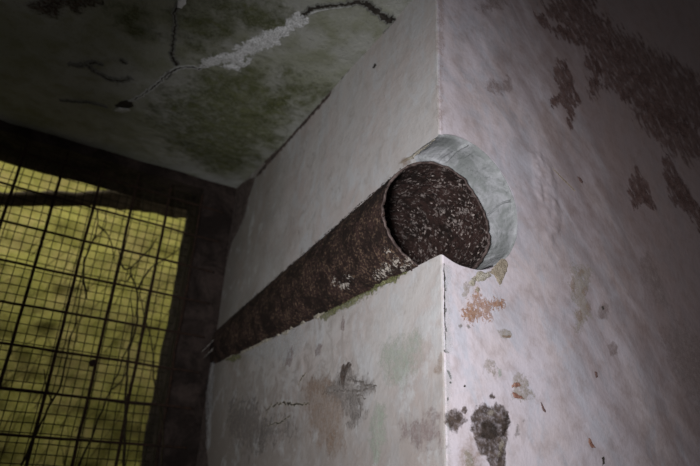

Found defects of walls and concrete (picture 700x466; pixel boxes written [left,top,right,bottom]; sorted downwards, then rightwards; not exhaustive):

crack [68,0,396,102]
damp [183,0,285,51]
crack [256,91,331,177]
flaking render [463,258,508,296]
damp [321,362,377,426]
damp [445,406,467,431]